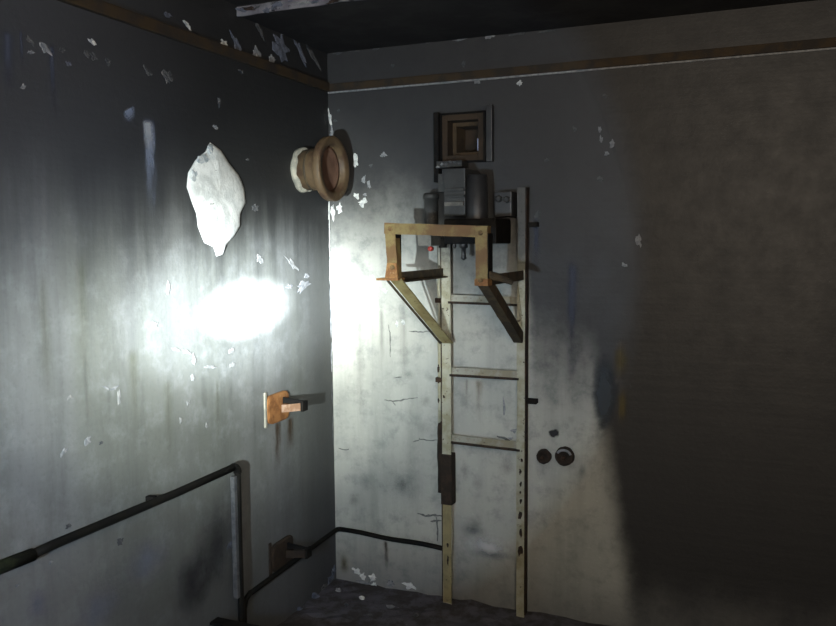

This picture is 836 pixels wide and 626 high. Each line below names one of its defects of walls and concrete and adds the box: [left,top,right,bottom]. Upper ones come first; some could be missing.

peeling [27,36,72,66]
peeling [84,38,111,66]
peeling [221,30,242,51]
peeling [354,164,373,208]
crack [417,513,442,541]